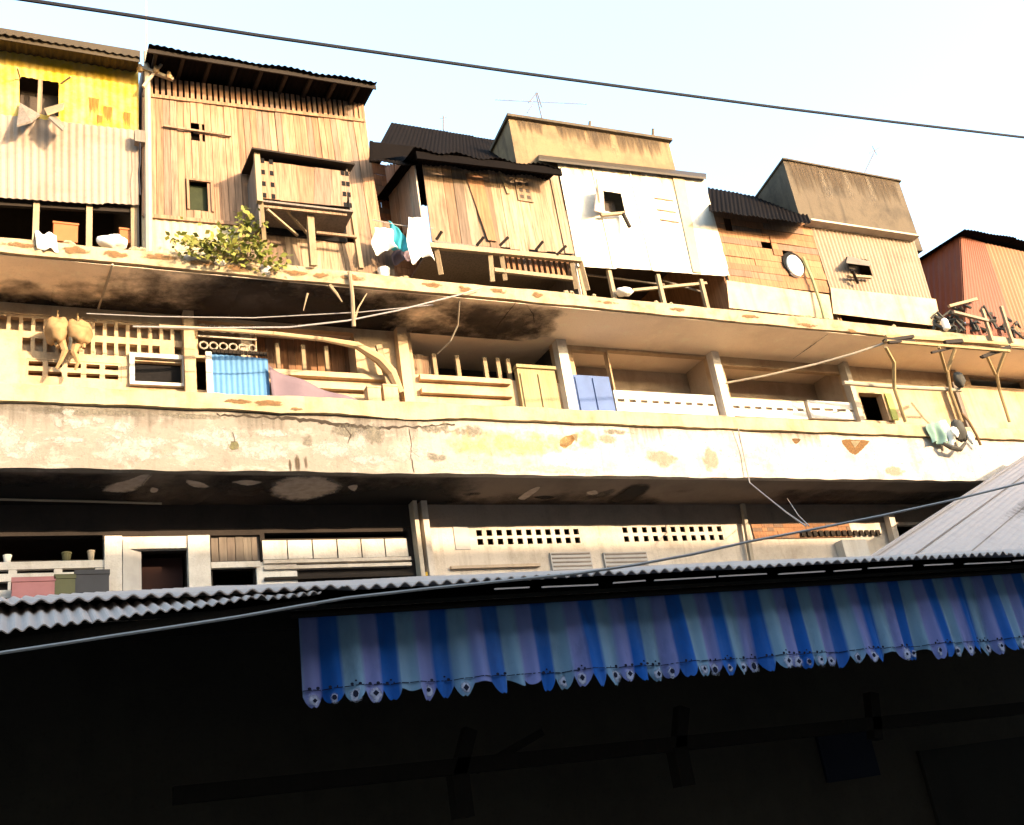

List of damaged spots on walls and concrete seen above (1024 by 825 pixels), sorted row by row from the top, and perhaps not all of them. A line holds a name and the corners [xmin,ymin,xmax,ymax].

water stain [789,162,898,195]
water stain [409,305,557,341]
crack [217,413,455,471]
spalling [560,434,578,448]
spalling [842,439,869,455]